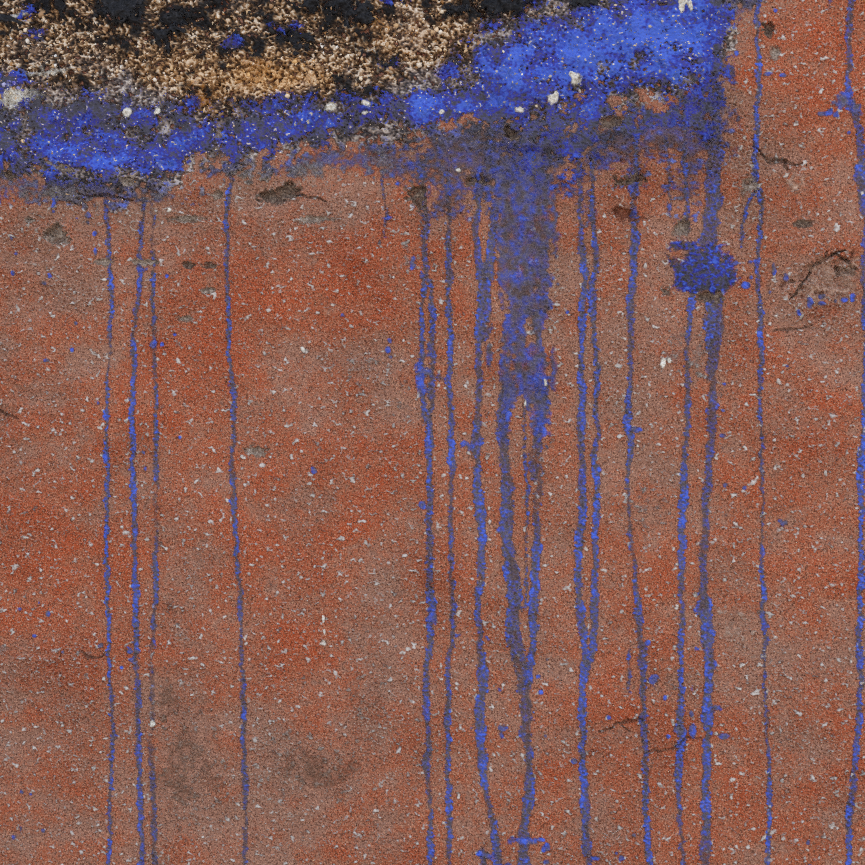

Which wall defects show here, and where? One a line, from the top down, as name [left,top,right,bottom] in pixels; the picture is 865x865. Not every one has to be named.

crack [789,250,857,300]